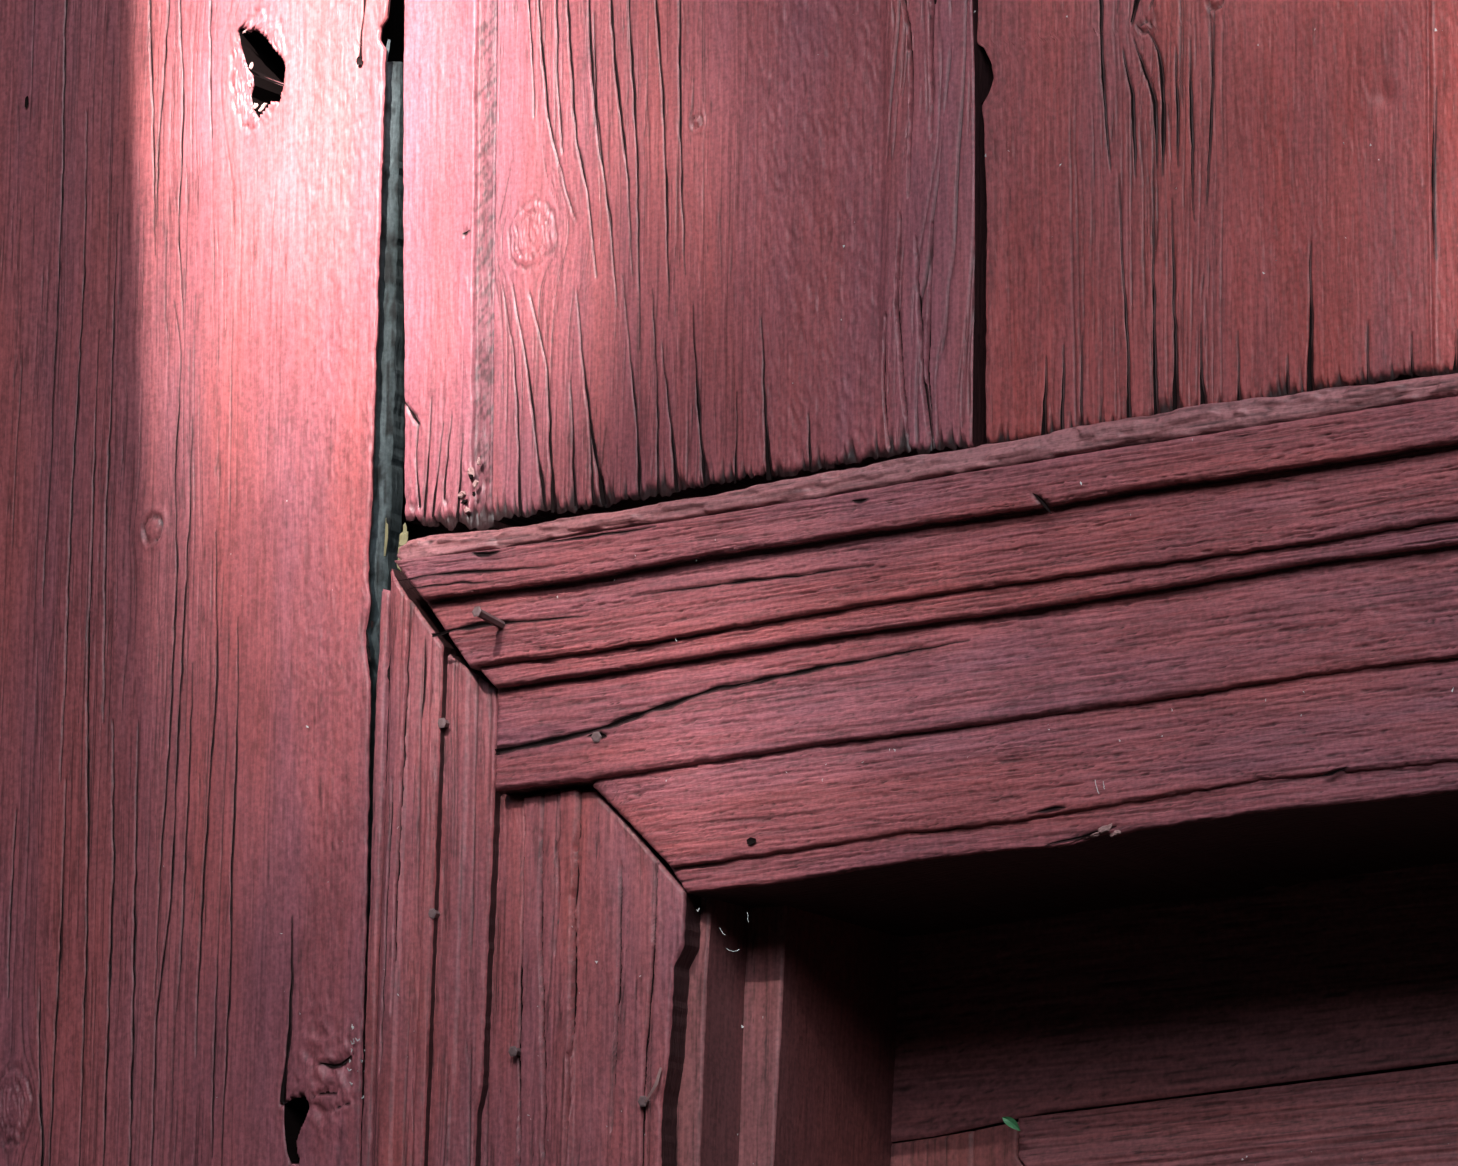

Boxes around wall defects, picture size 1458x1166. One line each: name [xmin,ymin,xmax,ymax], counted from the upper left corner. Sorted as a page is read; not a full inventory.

crack [905,0,936,84]
crack [1041,0,1240,435]